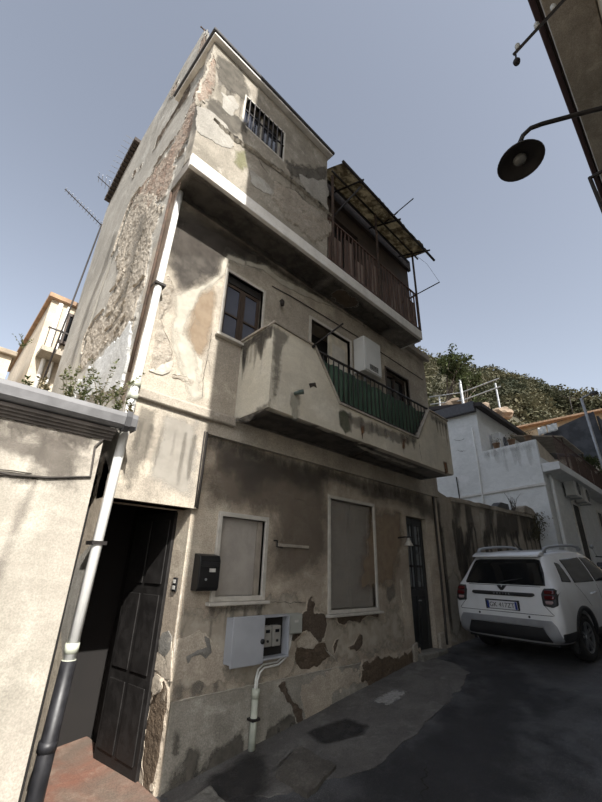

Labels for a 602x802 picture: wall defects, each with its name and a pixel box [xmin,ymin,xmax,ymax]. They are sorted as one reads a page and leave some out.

spalling [79,53,217,386]
spalling [271,180,332,245]
leakage [169,174,390,402]
leakage [125,408,153,487]
leakage [152,418,196,492]
leakage [236,394,429,479]
flaking render [141,630,226,794]
leakage [179,512,404,694]
leakage [308,719,368,743]
spalling [276,595,421,724]
leakage [362,486,542,636]